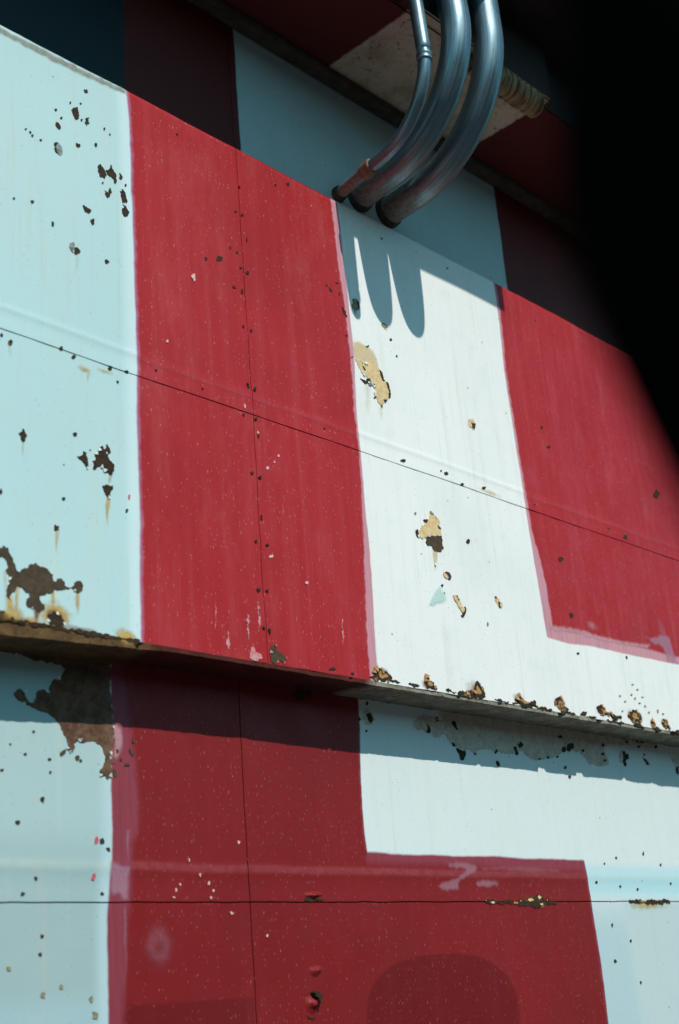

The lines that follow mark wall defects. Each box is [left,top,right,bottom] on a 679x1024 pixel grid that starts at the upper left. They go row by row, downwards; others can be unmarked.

peeling [97,164,129,217]
peeling [345,335,391,408]
rust [77,444,114,515]
rust [0,546,140,645]
peeling [414,511,467,617]
peeling [250,628,287,664]
peeling [372,665,390,682]
rust [12,653,135,779]
peeling [413,710,658,778]
peeling [628,709,671,729]